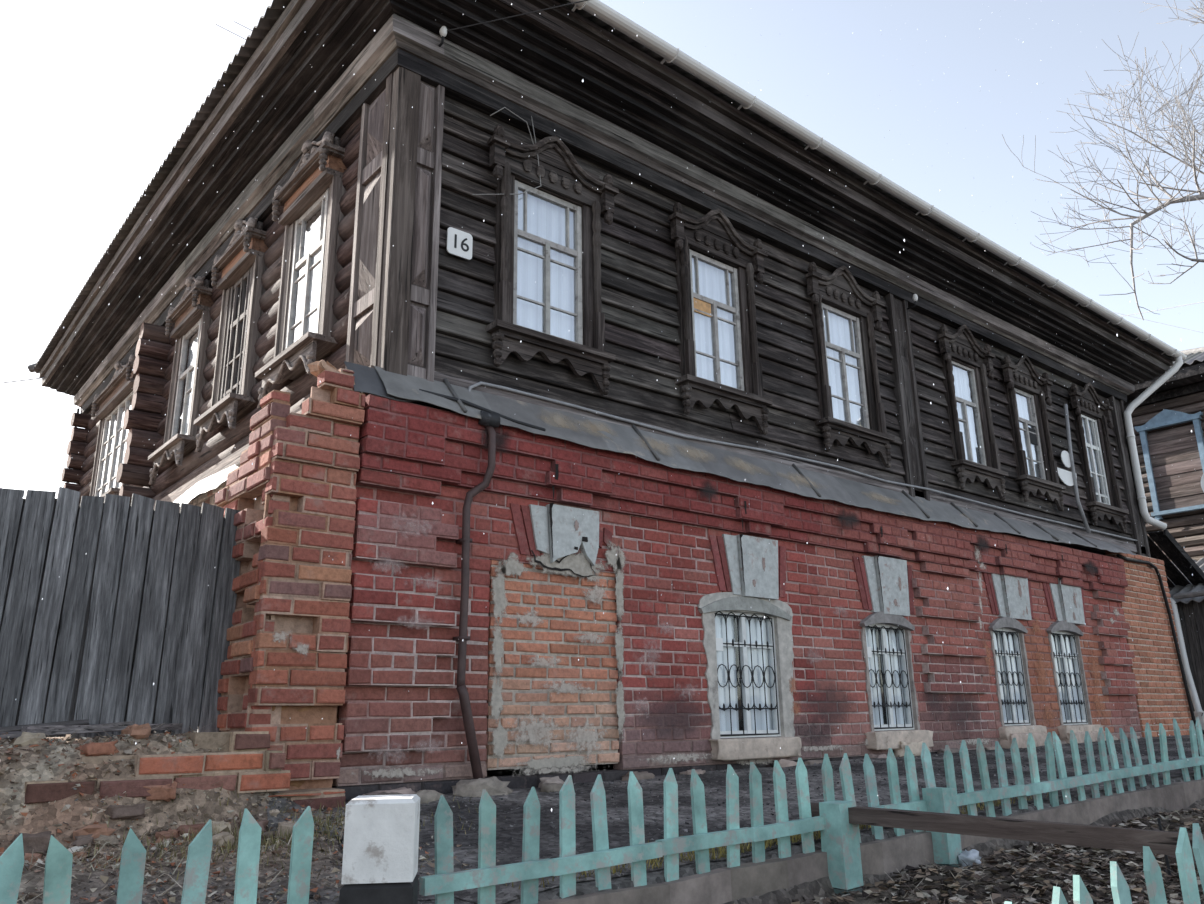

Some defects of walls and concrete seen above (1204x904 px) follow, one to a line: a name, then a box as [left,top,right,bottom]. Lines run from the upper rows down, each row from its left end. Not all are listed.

flaking render [491,520,626,775]
spalling [647,753,712,763]
spalling [364,768,442,778]